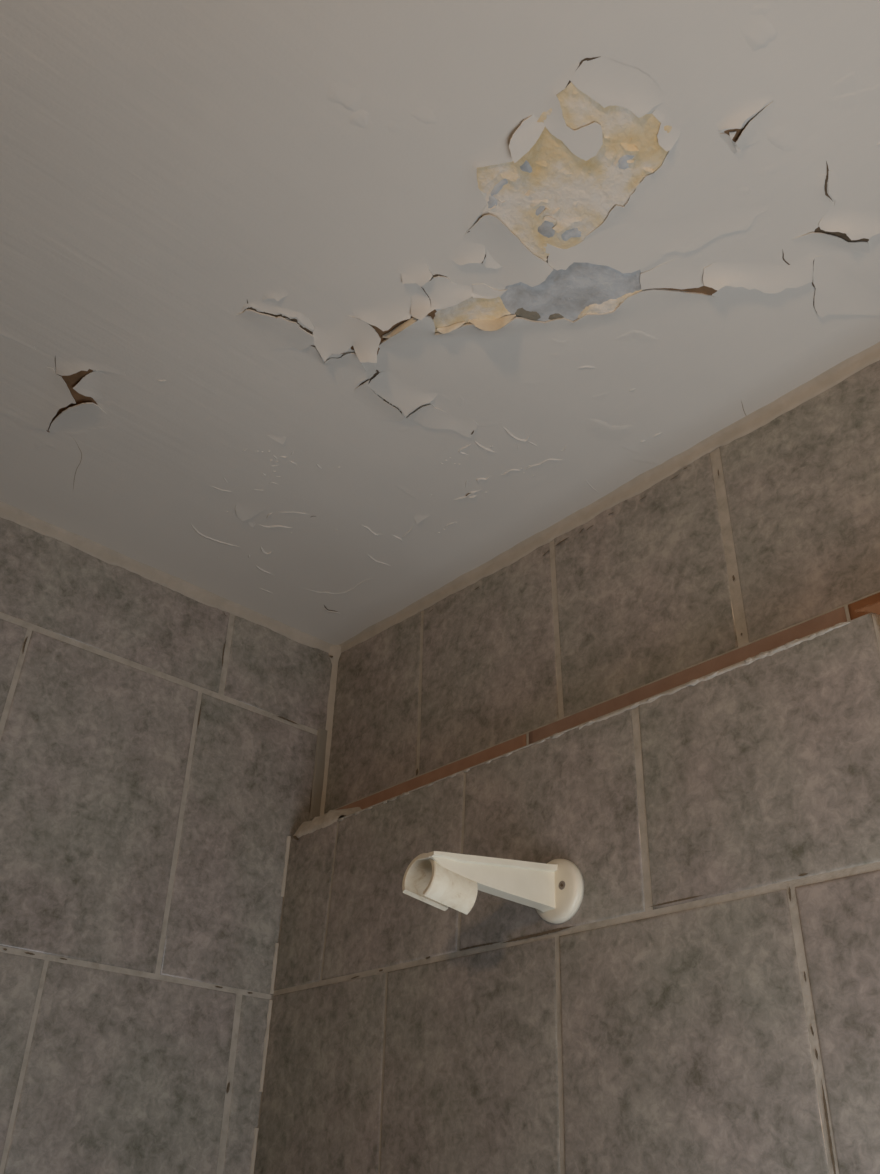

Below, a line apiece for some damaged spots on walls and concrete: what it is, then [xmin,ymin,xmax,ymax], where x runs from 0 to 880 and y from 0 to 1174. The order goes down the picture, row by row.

peeling [303,54,880,375]
peeling [0,357,125,439]